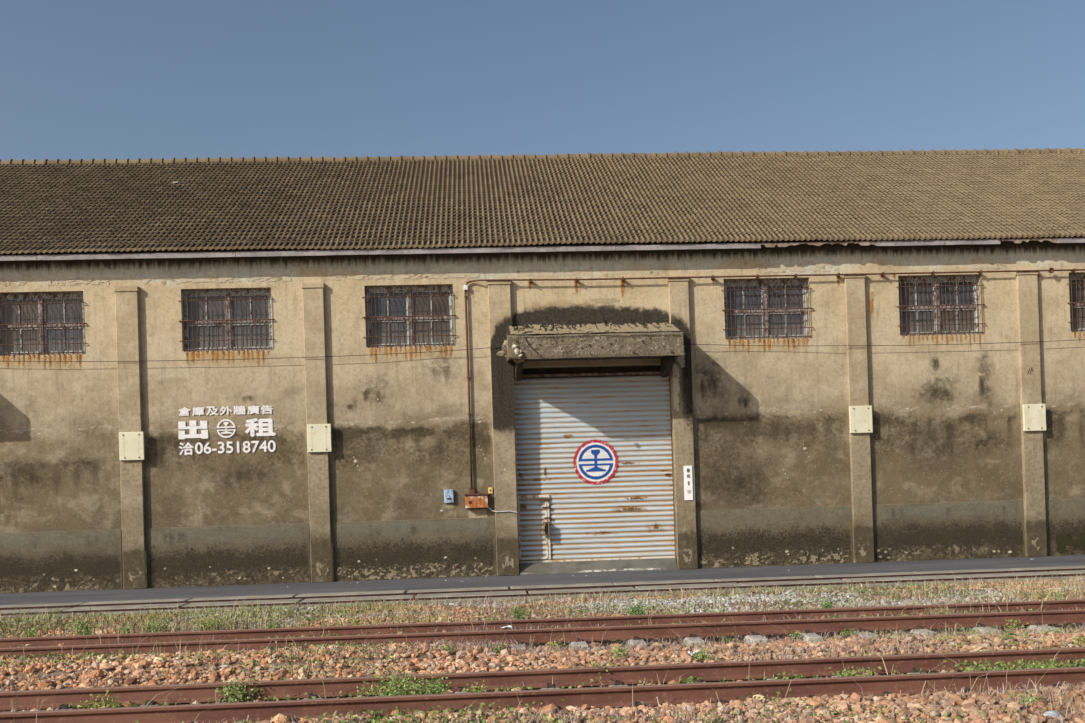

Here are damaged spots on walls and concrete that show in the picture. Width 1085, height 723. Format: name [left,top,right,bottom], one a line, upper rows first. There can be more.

corrosion [728,338,808,353]
corrosion [2,354,82,368]
corrosion [186,350,269,364]
corrosion [370,346,452,362]
spalling [497,322,685,412]
leakage [873,379,985,450]
leakage [148,424,216,459]